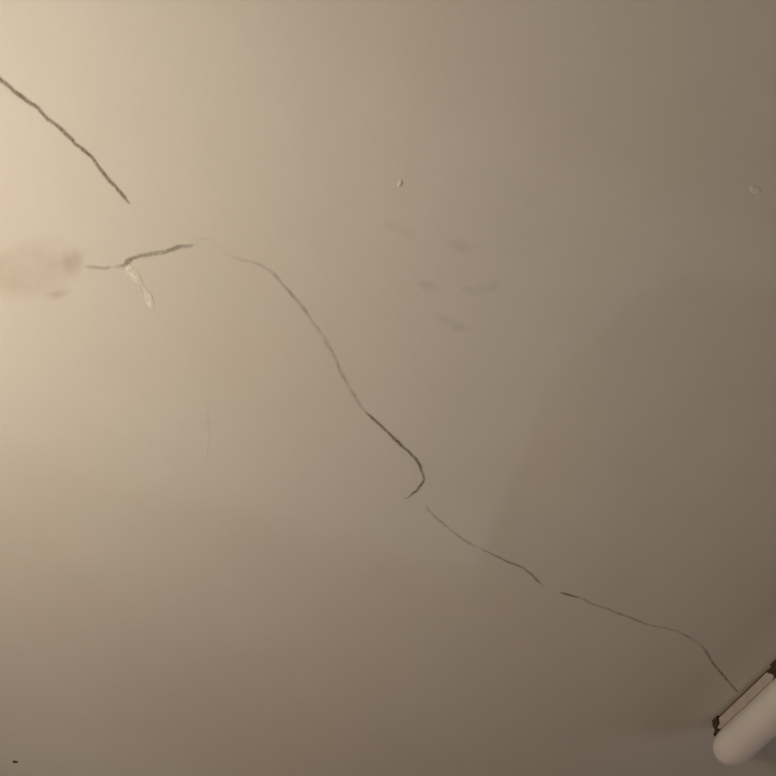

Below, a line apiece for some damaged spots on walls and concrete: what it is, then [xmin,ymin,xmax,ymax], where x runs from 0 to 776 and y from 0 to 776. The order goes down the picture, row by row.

crack [0,78,125,198]
crack [369,415,423,494]